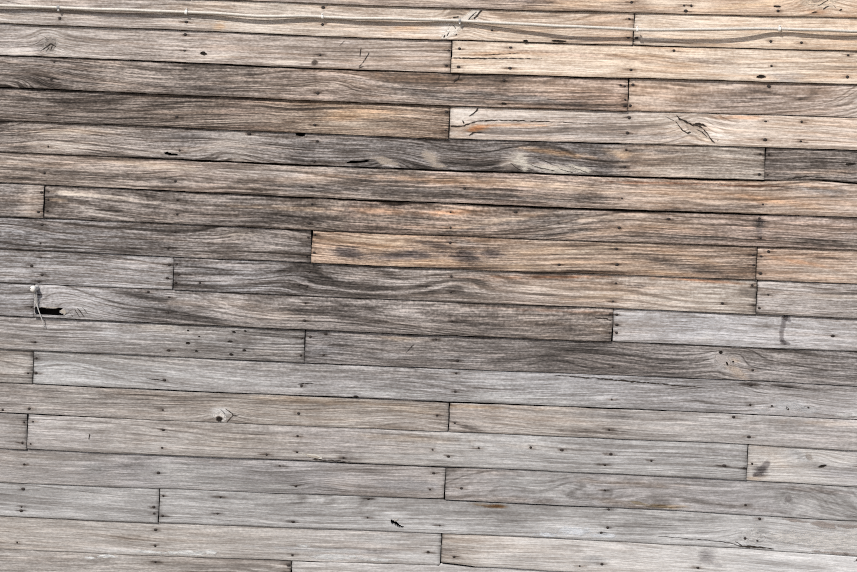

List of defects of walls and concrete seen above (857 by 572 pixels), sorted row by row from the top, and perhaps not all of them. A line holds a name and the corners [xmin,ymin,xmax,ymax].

crack [453,53,541,82]
crack [451,108,598,135]
crack [665,116,718,143]